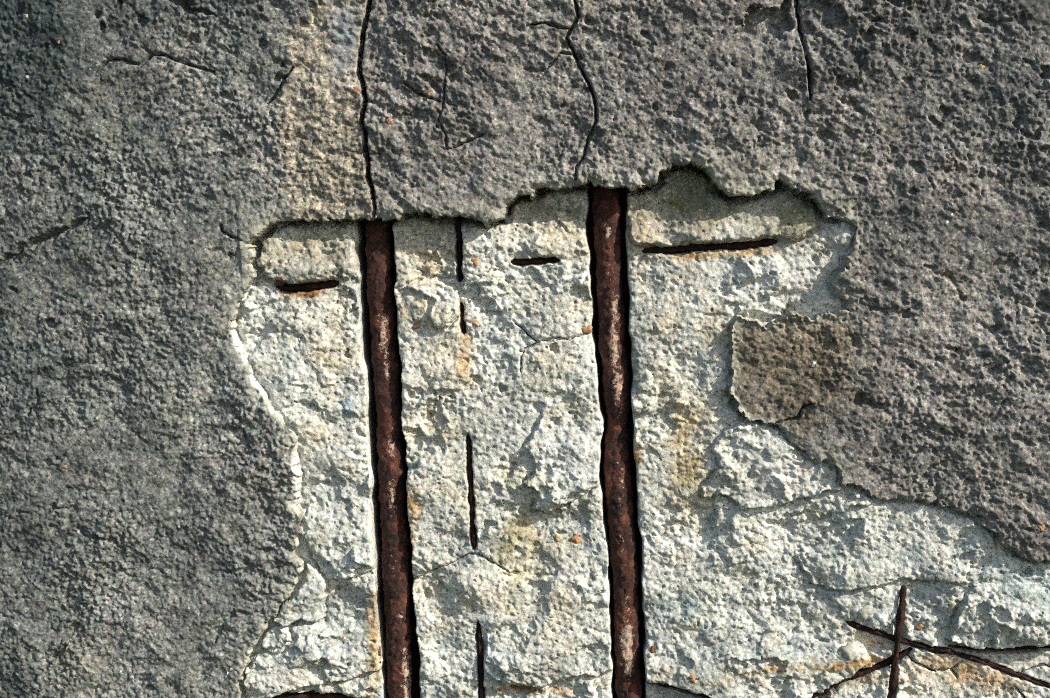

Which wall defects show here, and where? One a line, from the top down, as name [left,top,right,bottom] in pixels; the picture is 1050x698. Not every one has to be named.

crack [97,54,214,72]
crack [357,0,377,214]
crack [527,0,597,180]
crack [796,0,812,99]
spalling [227,0,1050,698]
crack [904,650,959,678]